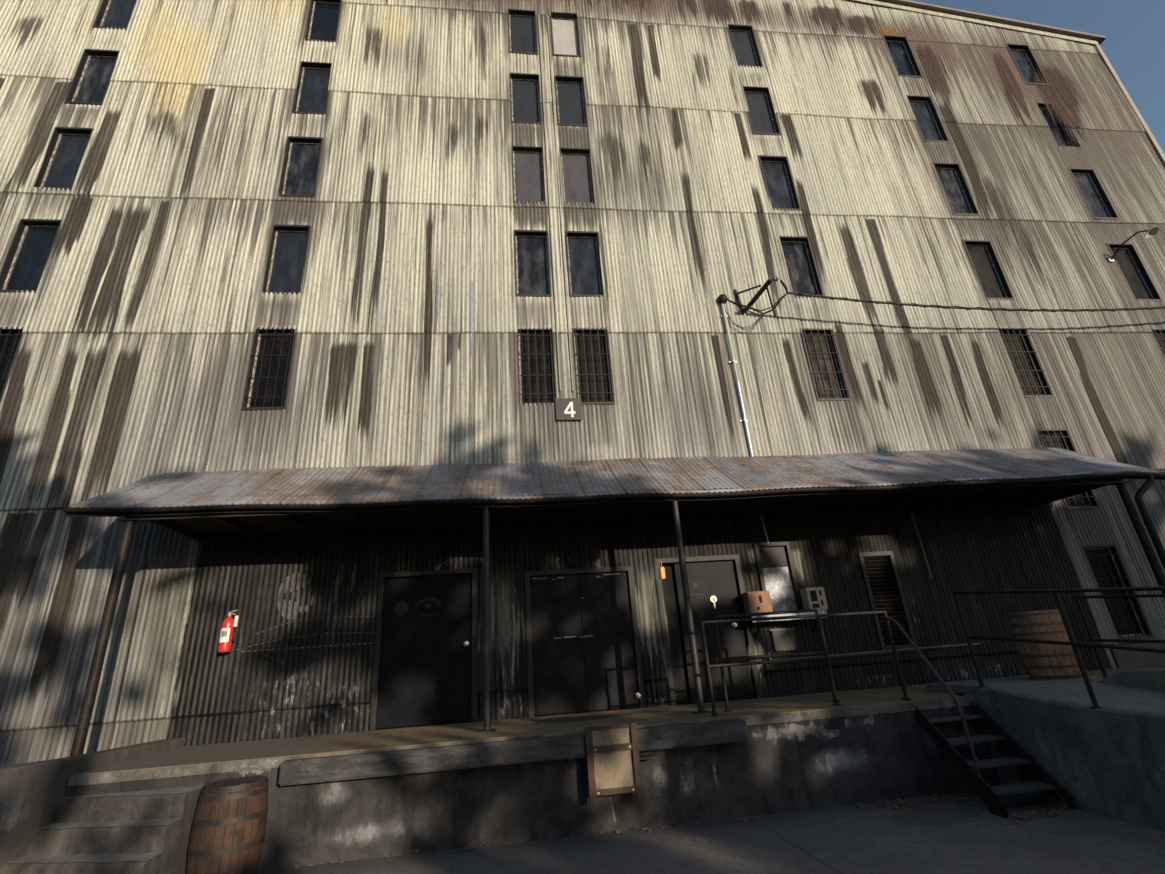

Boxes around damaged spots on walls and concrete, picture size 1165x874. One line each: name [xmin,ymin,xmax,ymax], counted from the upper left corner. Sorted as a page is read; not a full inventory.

rust [674,0,762,26]
rust [808,7,906,37]
rust [858,80,886,120]
rust [994,56,1040,143]
rust [1034,68,1095,153]
water stain [0,82,215,707]
water stain [325,115,388,441]
water stain [424,221,433,388]
water stain [752,187,813,424]
water stain [834,227,899,415]
water stain [866,219,943,421]
peeling [753,714,874,743]